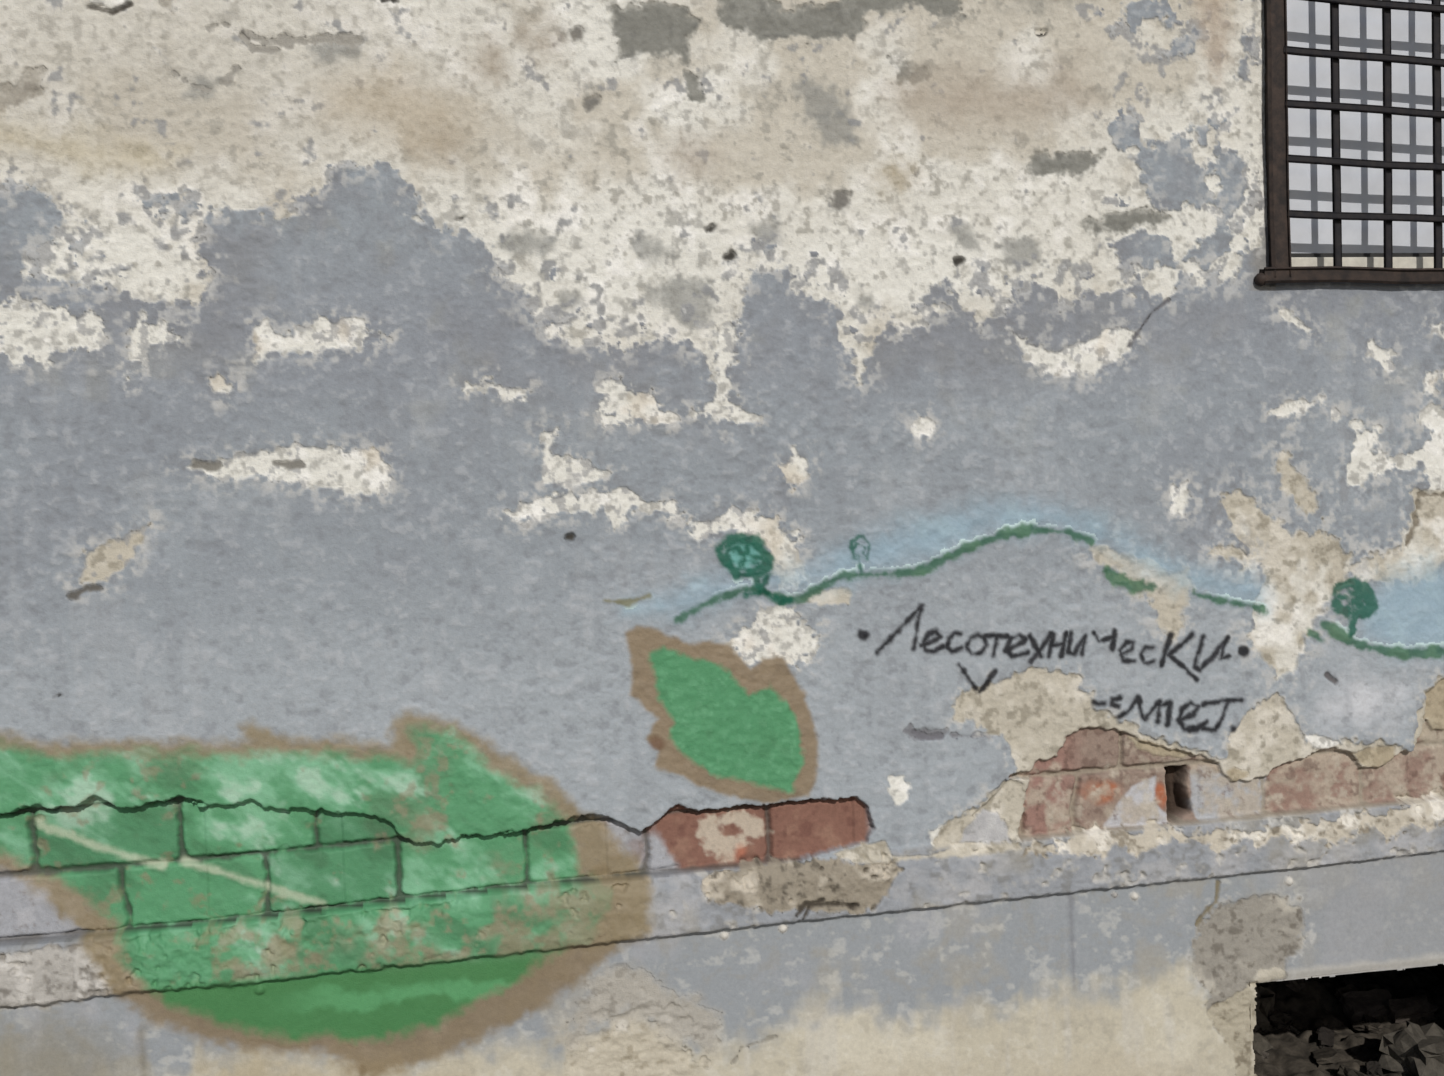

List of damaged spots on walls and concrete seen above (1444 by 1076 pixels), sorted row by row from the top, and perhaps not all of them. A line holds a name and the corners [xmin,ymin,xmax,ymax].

peeling [0,0,1268,428]
peeling [1365,339,1397,373]
peeling [1431,322,1444,338]
peeling [188,442,393,496]
spalling [929,370,1444,850]
peeling [887,775,910,806]
spalling [607,796,874,878]
spalling [0,879,78,946]
spalling [1192,880,1306,1076]
spalling [565,1015,711,1076]